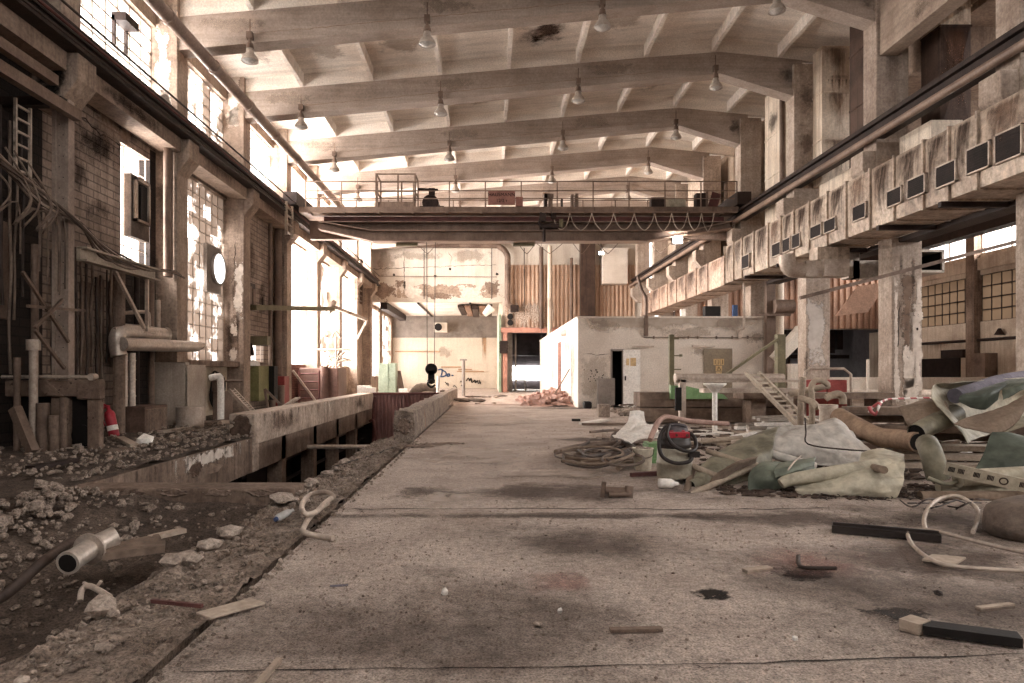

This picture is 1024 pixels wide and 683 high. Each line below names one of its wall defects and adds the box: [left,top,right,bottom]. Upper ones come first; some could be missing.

peeling [224,262,243,361]
peeling [376,273,553,327]
peeling [894,266,923,404]
spalling [187,461,204,478]